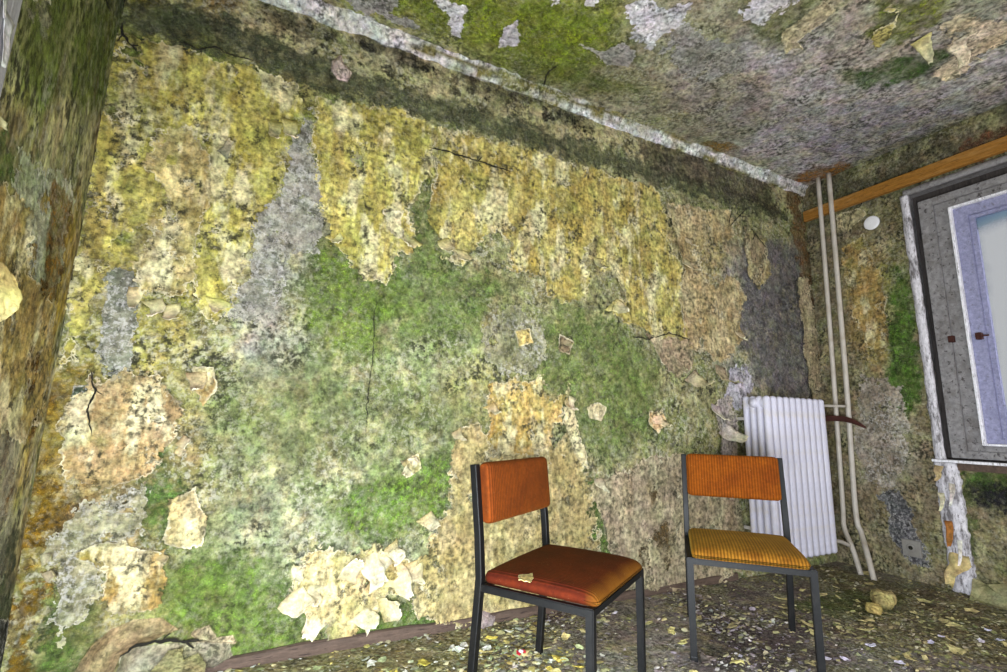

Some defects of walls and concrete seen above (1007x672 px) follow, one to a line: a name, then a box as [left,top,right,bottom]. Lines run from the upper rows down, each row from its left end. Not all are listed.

flaking render [433,0,468,38]
flaking render [498,20,521,48]
flaking render [579,0,752,85]
flaking render [737,0,800,27]
peeling [911,13,1007,82]
water stain [112,0,788,224]
crack [429,147,512,172]
flaking render [206,106,343,325]
water stain [966,483,1007,517]
flaking render [38,487,151,649]
peeling [277,564,327,642]
peeling [337,538,425,635]